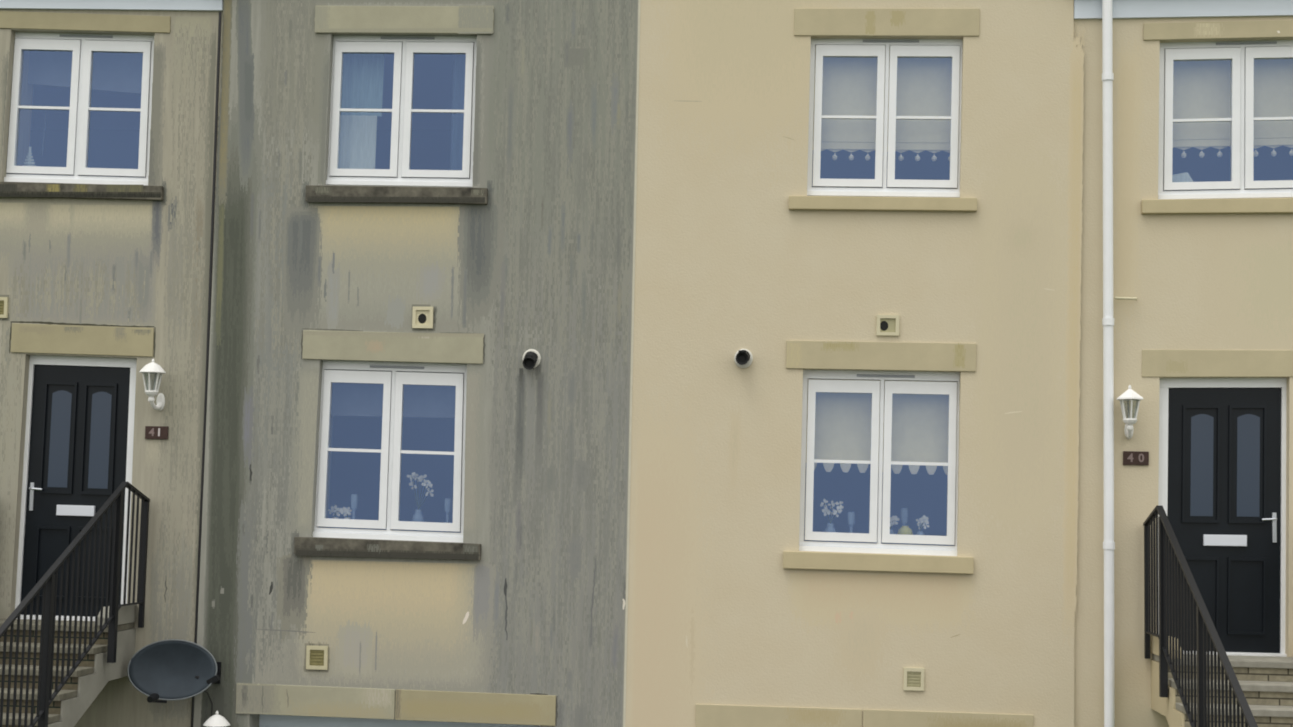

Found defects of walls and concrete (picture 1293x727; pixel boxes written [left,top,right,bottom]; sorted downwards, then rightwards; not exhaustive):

leakage [0,24,225,643]
leakage [212,0,906,727]